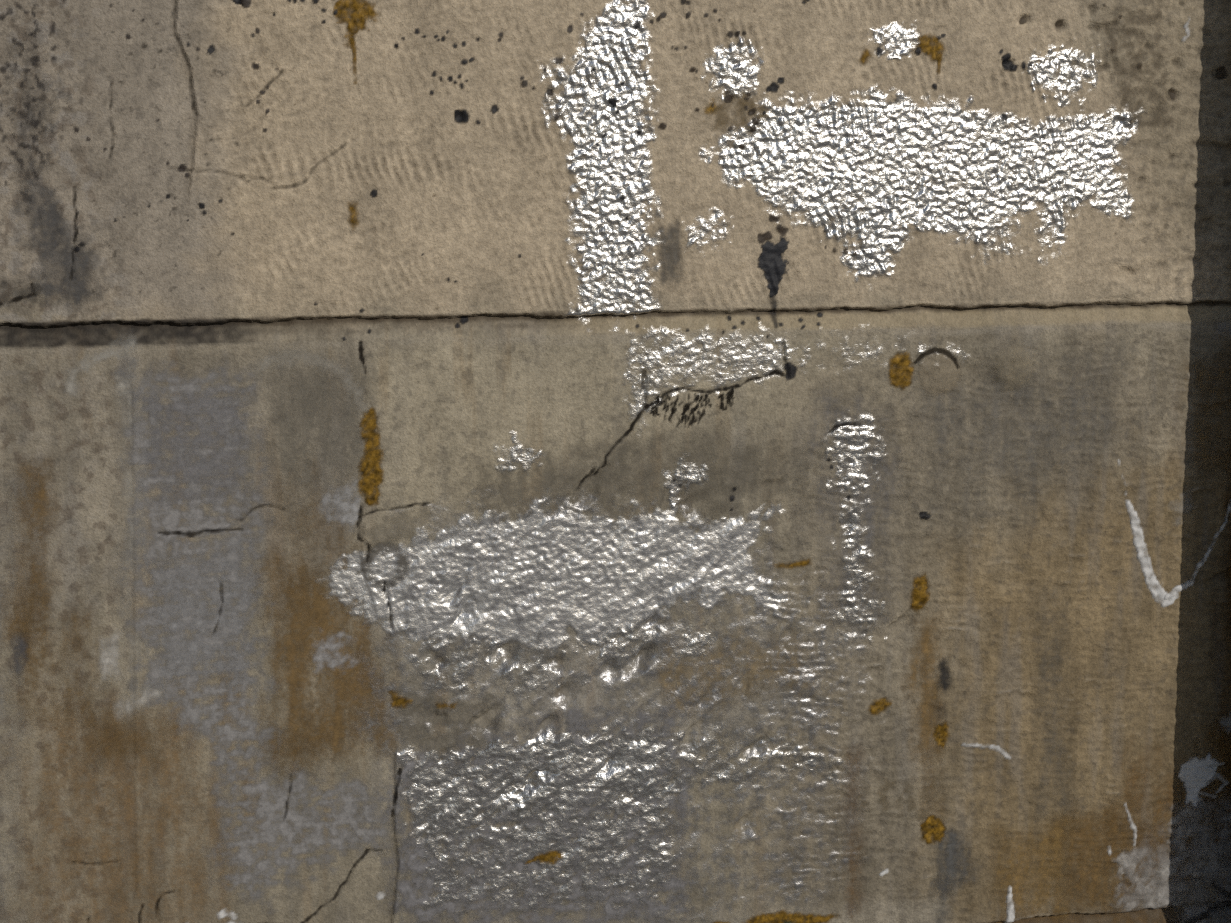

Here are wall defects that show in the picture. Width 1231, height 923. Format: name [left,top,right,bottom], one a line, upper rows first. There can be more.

damp [27,182,91,304]
crack [357,342,365,364]
crack [581,359,786,483]
crack [357,507,391,620]
crack [302,849,369,923]